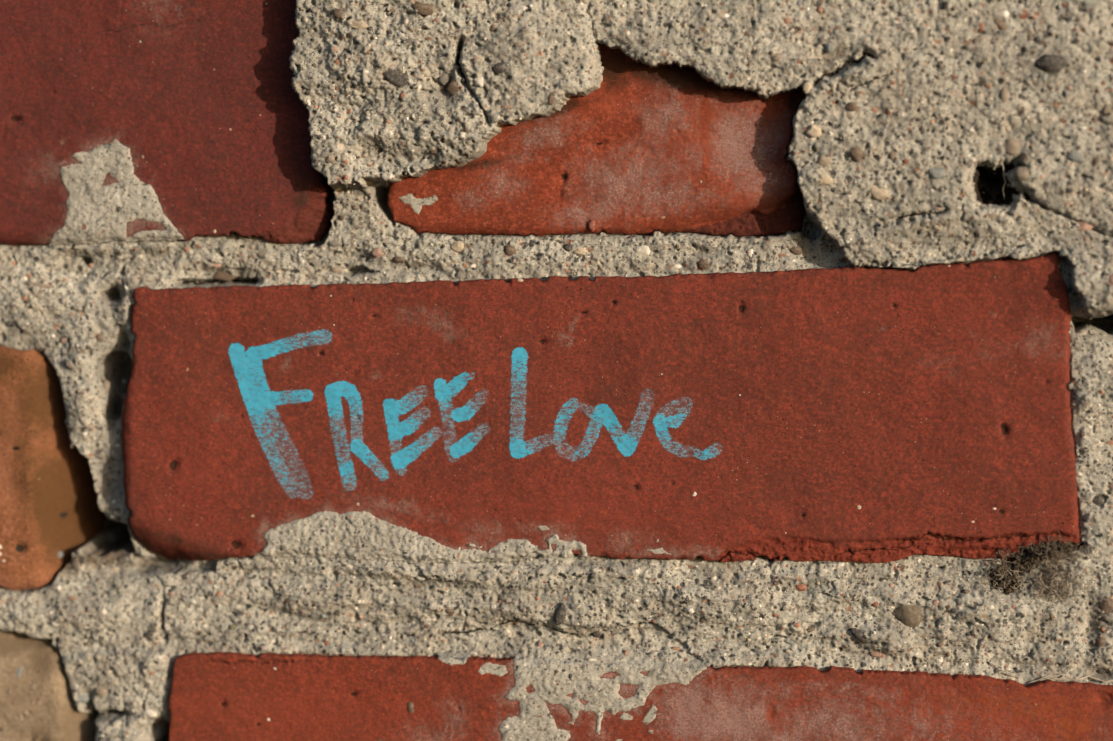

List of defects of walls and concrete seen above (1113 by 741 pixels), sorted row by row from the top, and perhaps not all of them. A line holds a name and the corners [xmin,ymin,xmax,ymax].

crack [455,42,489,124]
spalling [690,176,804,236]
spalling [720,534,1079,563]
damp [547,668,952,741]